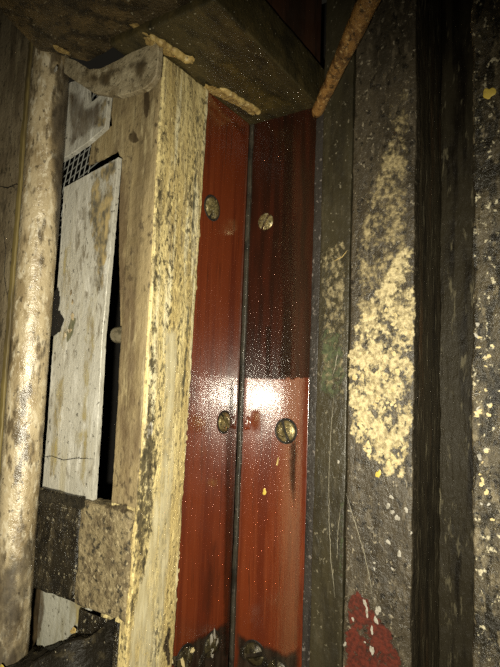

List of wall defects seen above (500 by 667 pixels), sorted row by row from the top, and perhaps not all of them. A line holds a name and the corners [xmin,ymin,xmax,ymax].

water stain [130,398,157,614]